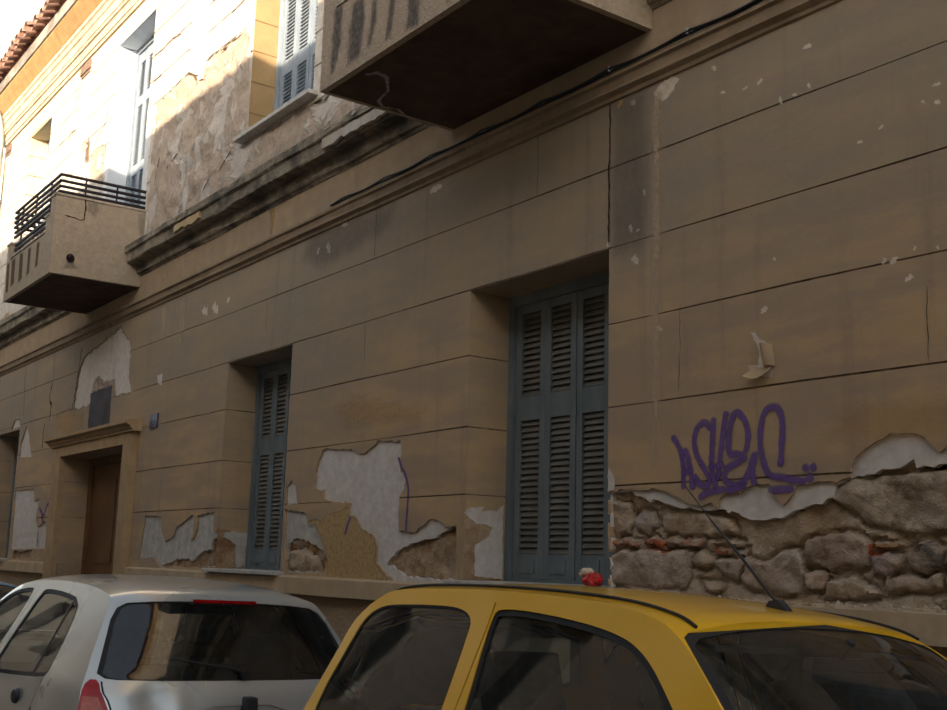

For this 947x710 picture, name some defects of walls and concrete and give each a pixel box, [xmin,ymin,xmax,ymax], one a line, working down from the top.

damp [331,0,376,71]
damp [407,0,418,29]
peeling [75,327,132,409]
peeling [13,420,31,457]
peeling [12,490,46,559]
peeling [140,512,247,569]
peeling [286,440,504,583]
flaking render [608,433,947,612]